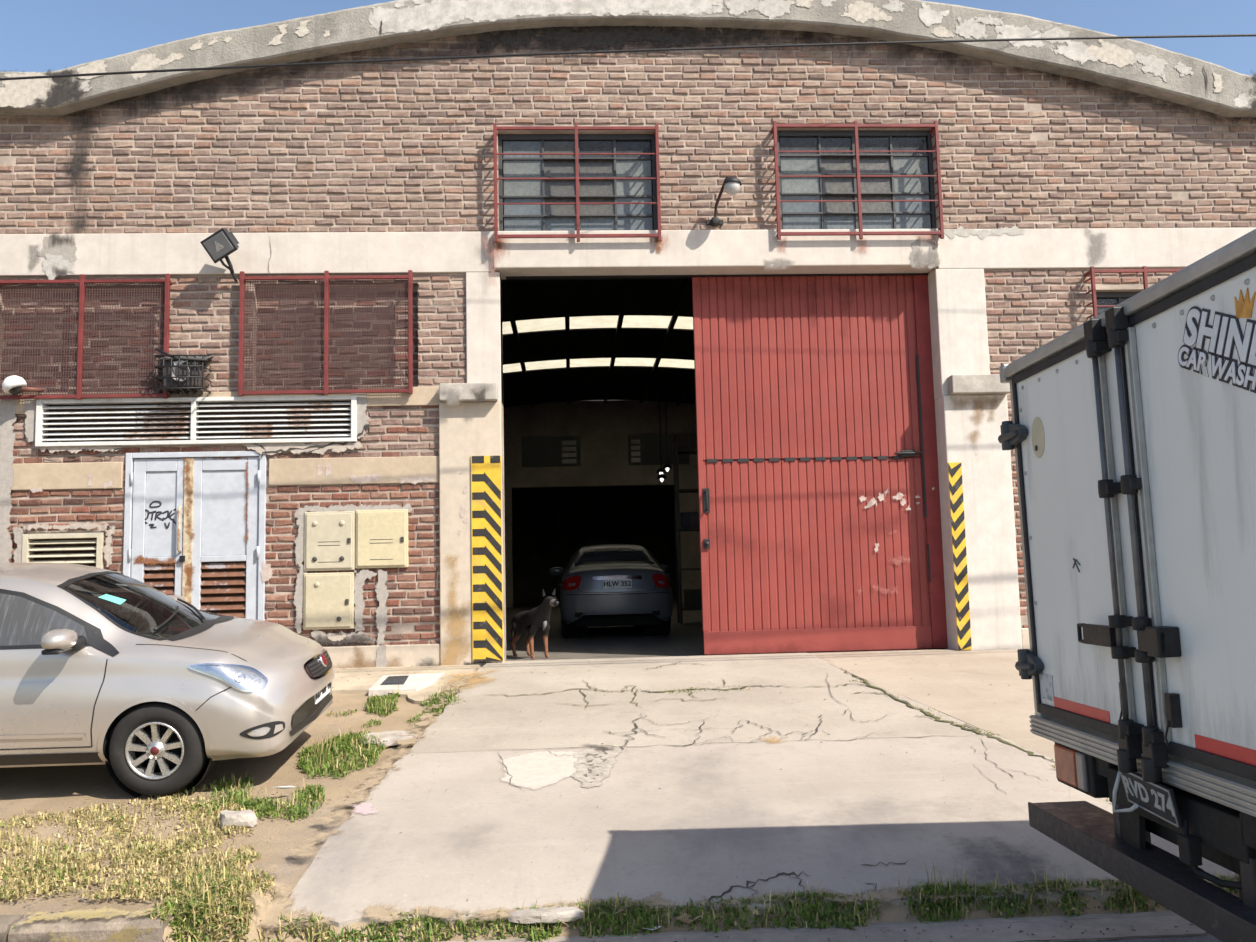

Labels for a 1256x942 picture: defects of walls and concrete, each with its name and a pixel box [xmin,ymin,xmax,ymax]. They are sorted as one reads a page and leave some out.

peeling [0,72,63,108]
peeling [77,60,108,92]
peeling [130,36,232,80]
damp [353,26,960,67]
peeling [366,0,1194,82]
damp [34,56,338,186]
damp [74,216,85,230]
peeling [29,234,76,280]
peeling [859,487,935,510]
crack [464,662,1055,794]
crack [695,871,811,907]
crack [861,859,909,890]